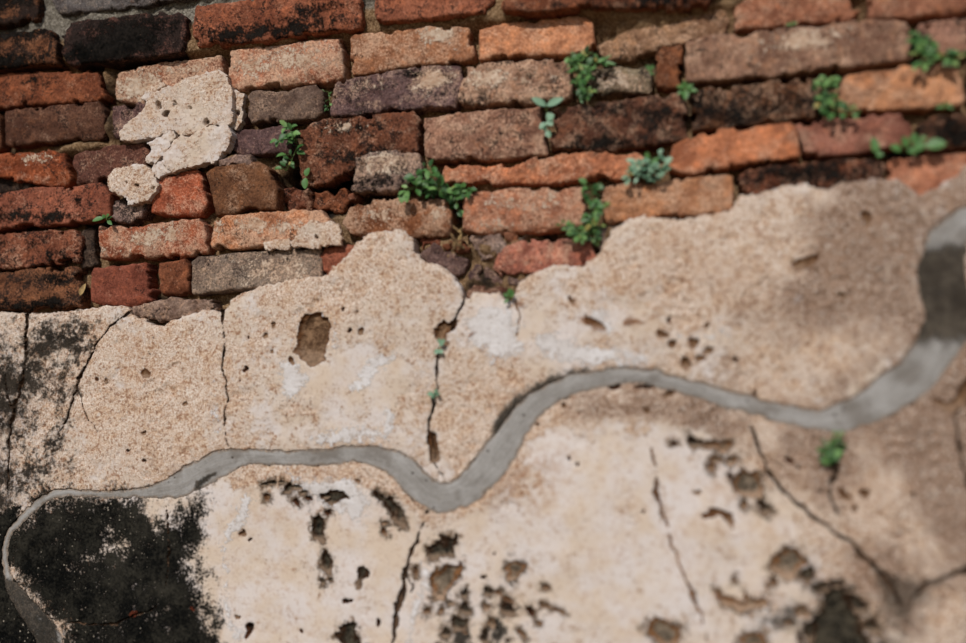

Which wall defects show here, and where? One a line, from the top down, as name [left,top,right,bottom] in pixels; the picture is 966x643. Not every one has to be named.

peeling [107,69,248,207]
water stain [222,250,308,287]
peeling [263,220,344,252]
spalling [791,253,819,271]
spalling [860,211,872,228]
crack [5,313,29,489]
crack [57,311,130,435]
water stain [0,240,251,643]
crack [220,309,230,447]
crack [427,296,465,476]
crack [392,497,429,643]
crack [750,426,966,612]